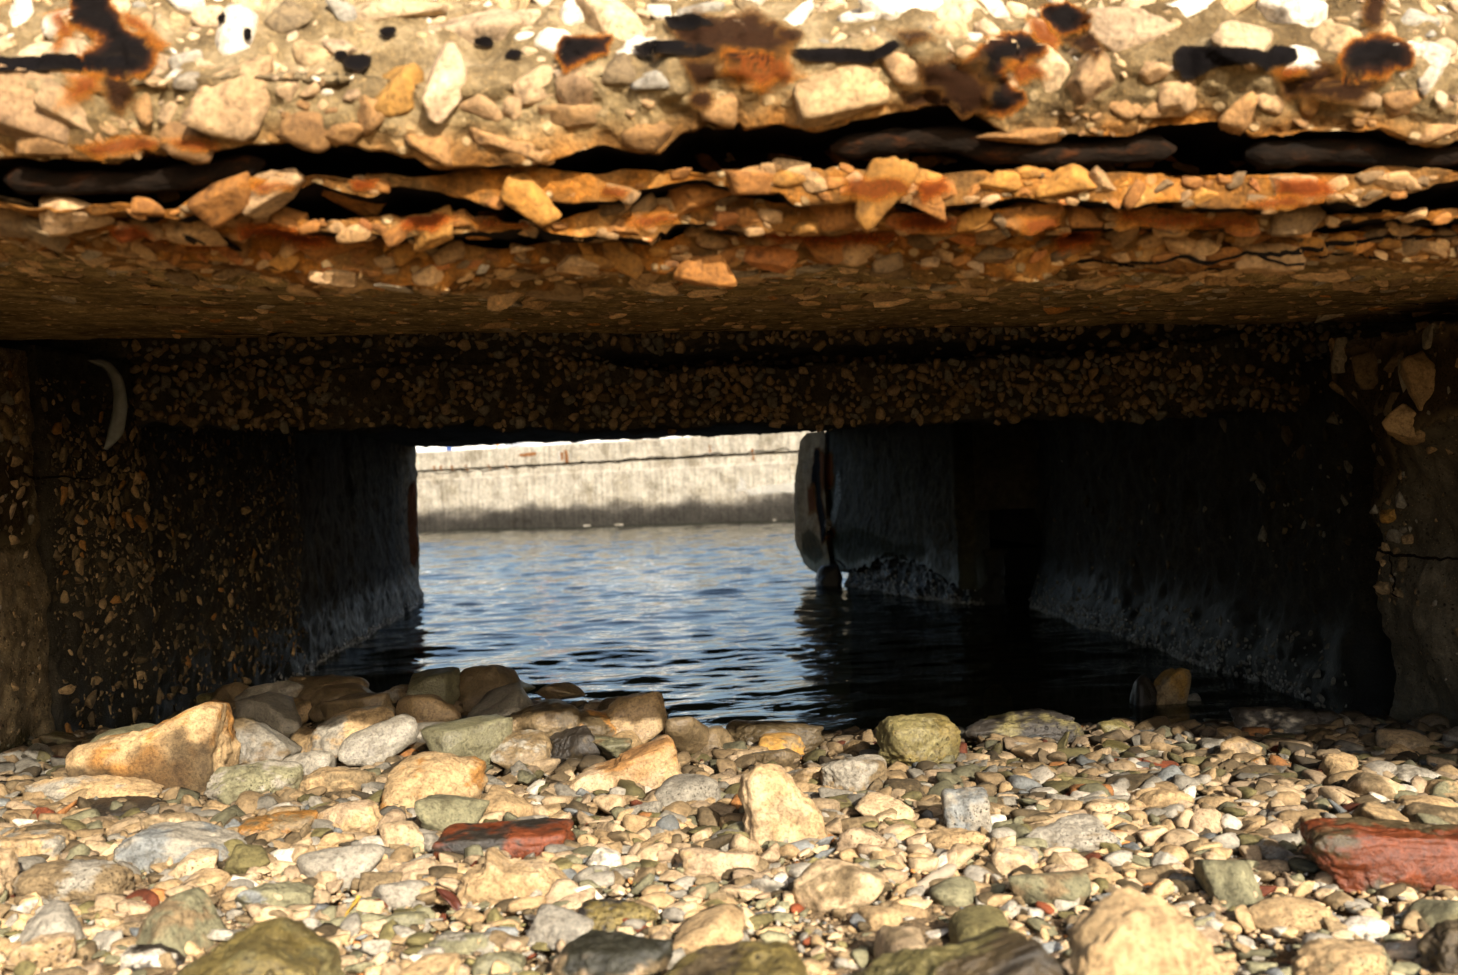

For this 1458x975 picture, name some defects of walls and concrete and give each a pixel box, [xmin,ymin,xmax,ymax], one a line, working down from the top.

corrosion [49,0,168,118]
corrosion [554,31,614,74]
corrosion [632,7,805,110]
corrosion [888,1,1105,119]
corrosion [1268,0,1416,104]
corrosion [78,135,221,160]
corrosion [236,223,332,250]
corrosion [402,212,454,232]
spalling [0,125,1458,288]
corrosion [740,176,959,247]
corrosion [1022,215,1097,251]
corrosion [1118,177,1334,231]